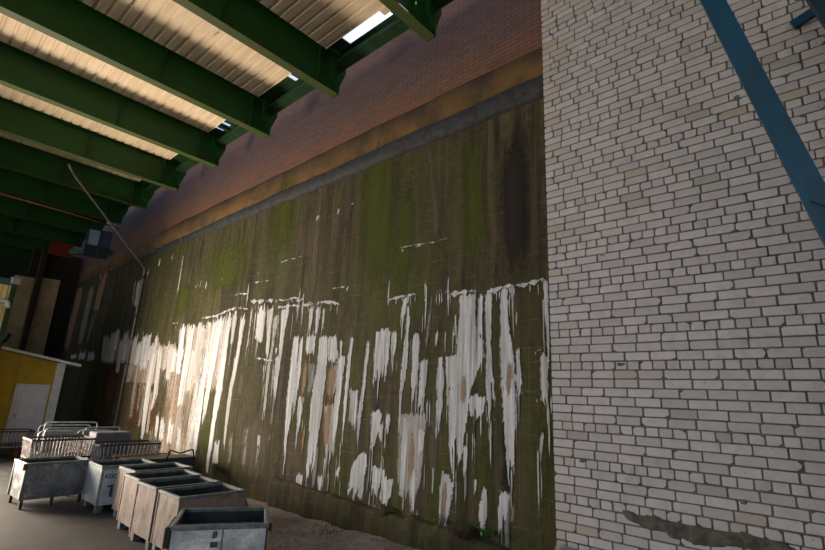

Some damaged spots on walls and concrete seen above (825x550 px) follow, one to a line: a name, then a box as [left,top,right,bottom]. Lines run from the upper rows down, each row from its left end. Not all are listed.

leakage [71,129,552,548]